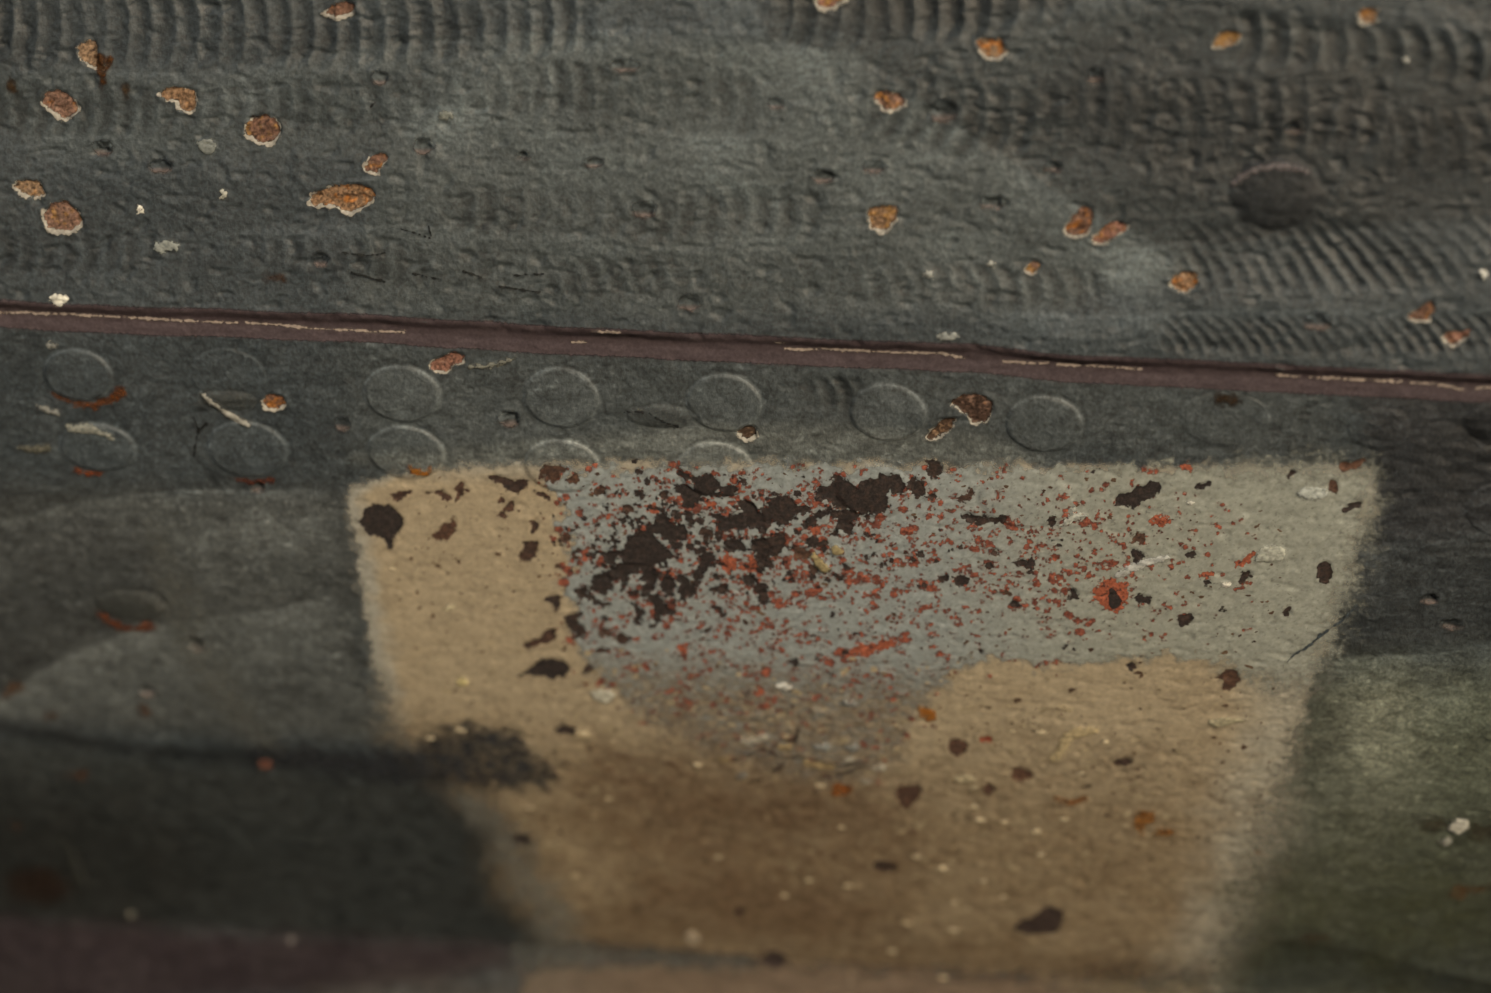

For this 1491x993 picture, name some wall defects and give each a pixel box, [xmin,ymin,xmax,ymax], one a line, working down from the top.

peeling [813,0,849,13]
peeling [40,89,81,122]
peeling [156,86,198,115]
peeling [244,114,281,147]
peeling [12,179,83,236]
peeling [867,204,899,235]
peeling [1063,206,1131,246]
peeling [497,393,1378,785]
water stain [251,721,556,791]